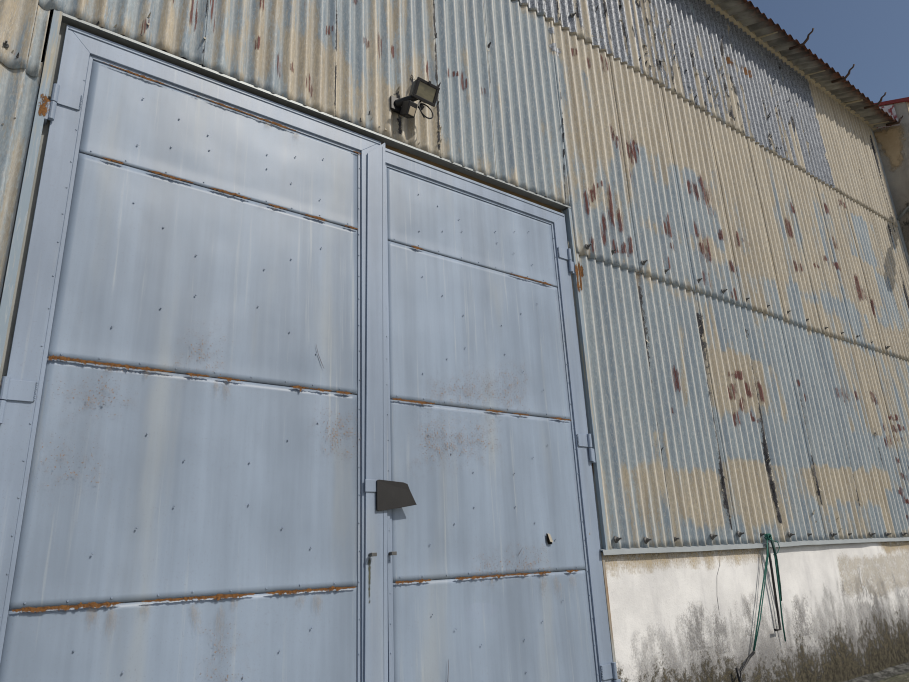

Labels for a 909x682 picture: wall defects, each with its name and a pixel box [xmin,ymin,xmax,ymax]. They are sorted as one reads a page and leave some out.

rust [575,263,584,292]
rust [186,331,247,382]
rust [48,355,182,416]
rust [392,398,528,469]
damp [604,548,759,567]
rust [12,601,123,613]
rust [142,593,255,602]
rust [267,586,356,595]
damp [617,596,909,682]